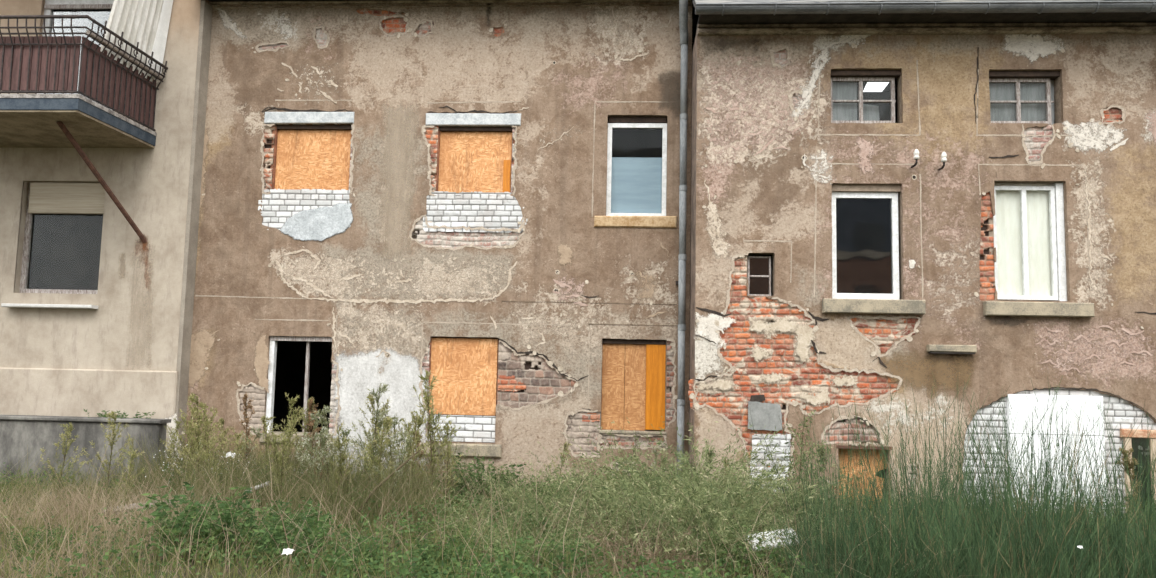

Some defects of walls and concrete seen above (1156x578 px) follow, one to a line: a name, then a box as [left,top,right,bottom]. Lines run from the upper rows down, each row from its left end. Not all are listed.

spalling [356,8,434,38]
crack [972,49,980,121]
peeling [1005,34,1065,62]
spalling [342,123,355,198]
spalling [421,125,438,196]
spalling [562,35,922,493]
spalling [974,192,995,301]
peeling [1021,105,1128,306]
peeling [188,329,220,387]
spalling [236,334,270,435]
peeling [268,214,525,436]
spalling [490,243,589,411]